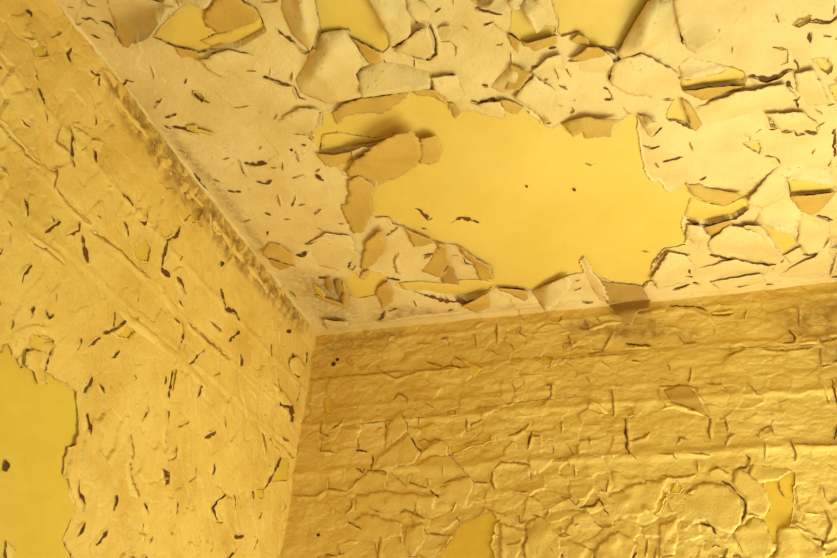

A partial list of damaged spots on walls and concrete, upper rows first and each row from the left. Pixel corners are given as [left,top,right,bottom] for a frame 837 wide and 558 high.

crack [50,0,123,86]
peeling [106,0,265,77]
crack [243,28,321,114]
peeling [278,0,837,326]
crack [643,142,695,168]
peeling [262,242,295,270]
crack [642,246,837,291]
crack [0,70,592,558]
peeling [0,333,80,558]
crack [536,280,837,558]
peeling [416,510,637,558]
peeling [603,464,837,558]